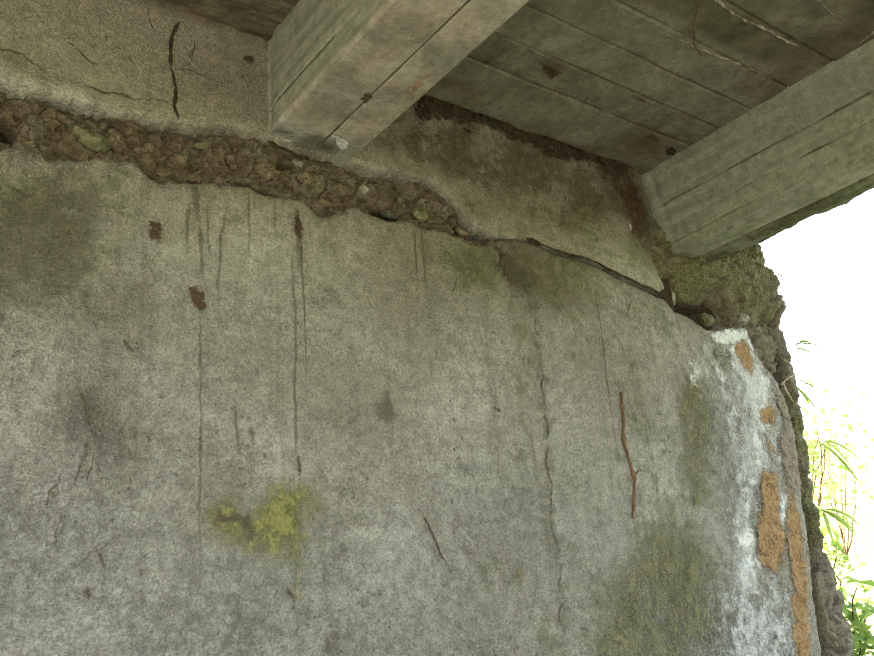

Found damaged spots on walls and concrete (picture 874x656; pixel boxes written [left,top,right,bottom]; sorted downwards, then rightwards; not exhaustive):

crack [85,10,212,119]
rust [148,221,163,243]
rust [189,286,206,311]
spalling [0,91,532,298]
water stain [293,210,306,417]
crack [526,237,674,316]
crack [519,275,565,632]
water stain [712,329,811,656]